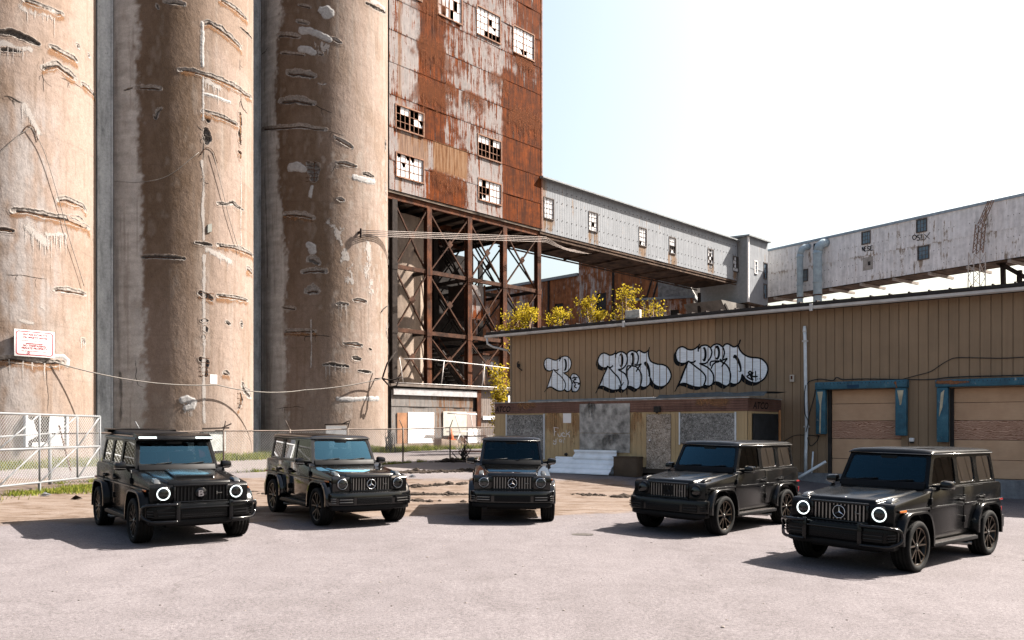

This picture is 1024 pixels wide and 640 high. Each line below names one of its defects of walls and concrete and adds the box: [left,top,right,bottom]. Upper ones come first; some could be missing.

spalling [0,25,96,101]
rust [413,0,509,112]
rust [514,56,535,73]
spalling [174,65,252,162]
spalling [261,121,387,203]
spalling [0,193,91,237]